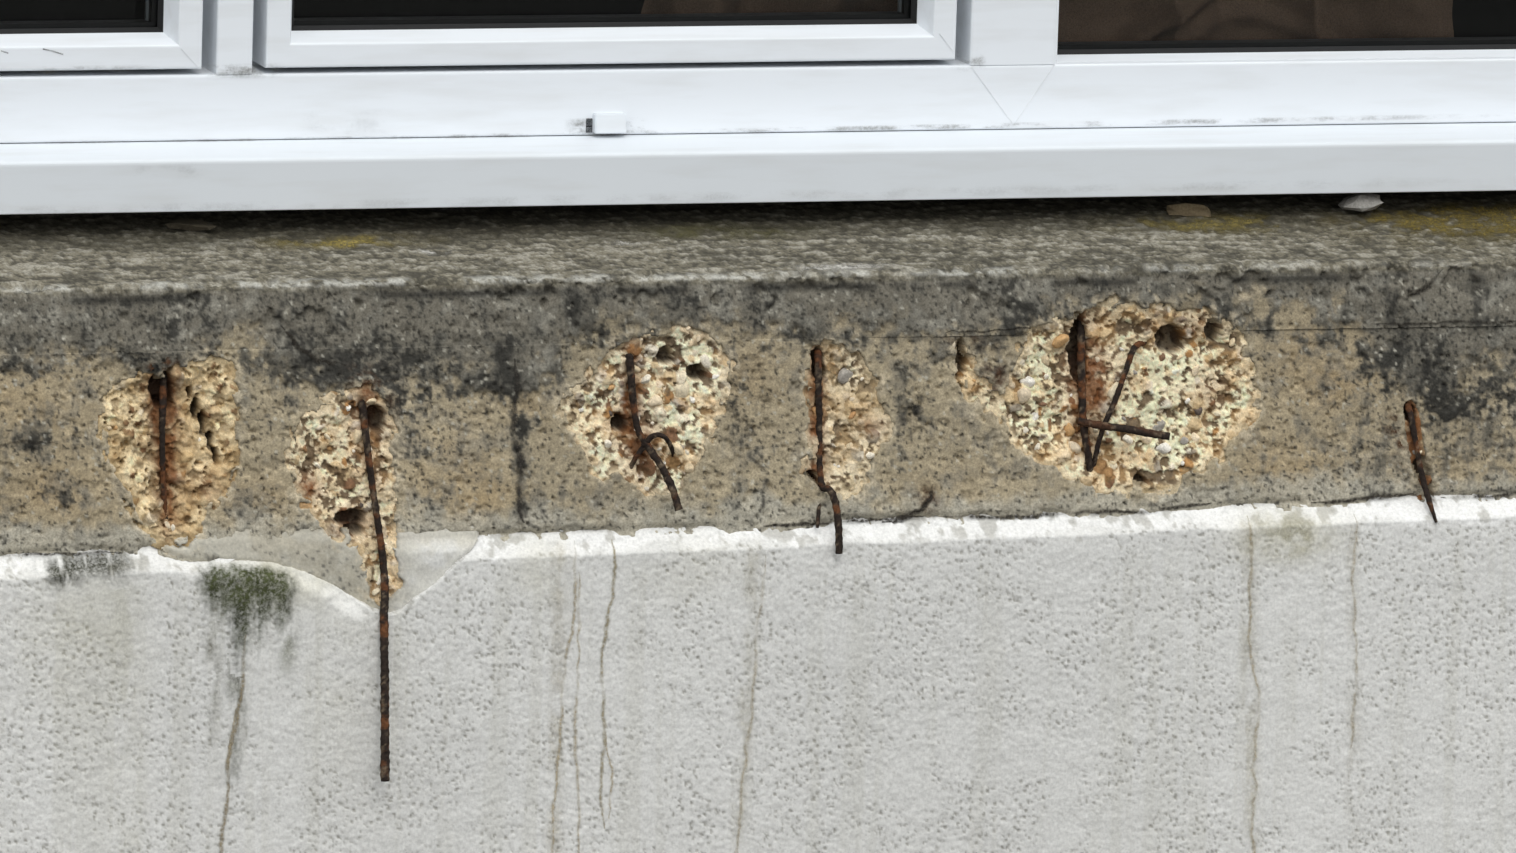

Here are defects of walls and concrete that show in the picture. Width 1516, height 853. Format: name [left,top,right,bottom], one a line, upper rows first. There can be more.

spalling [555,325,736,511]
spalling [799,339,894,554]
spalling [952,294,1262,499]
spalling [96,354,479,782]